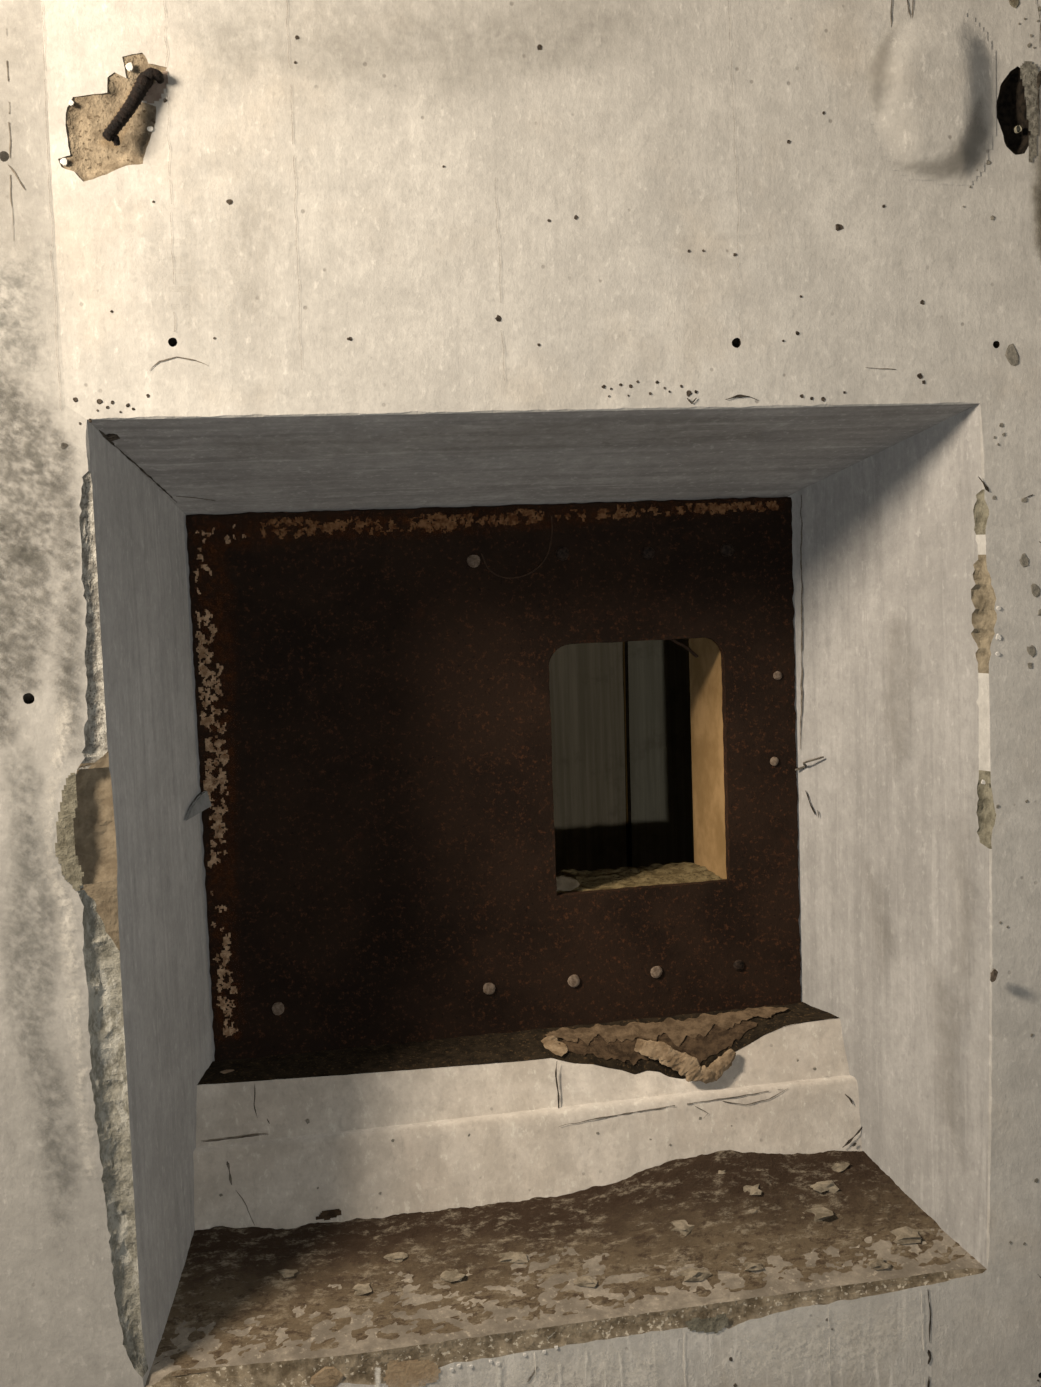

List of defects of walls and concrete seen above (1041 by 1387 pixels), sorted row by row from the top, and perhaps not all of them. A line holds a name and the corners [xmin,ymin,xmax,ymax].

spalling [58,53,168,182]
leakage [0,380,77,756]
spalling [973,489,996,535]
spalling [971,555,1001,674]
leakage [55,773,84,942]
rust [193,509,613,1038]
spalling [73,471,987,1387]
spalling [976,770,1000,849]